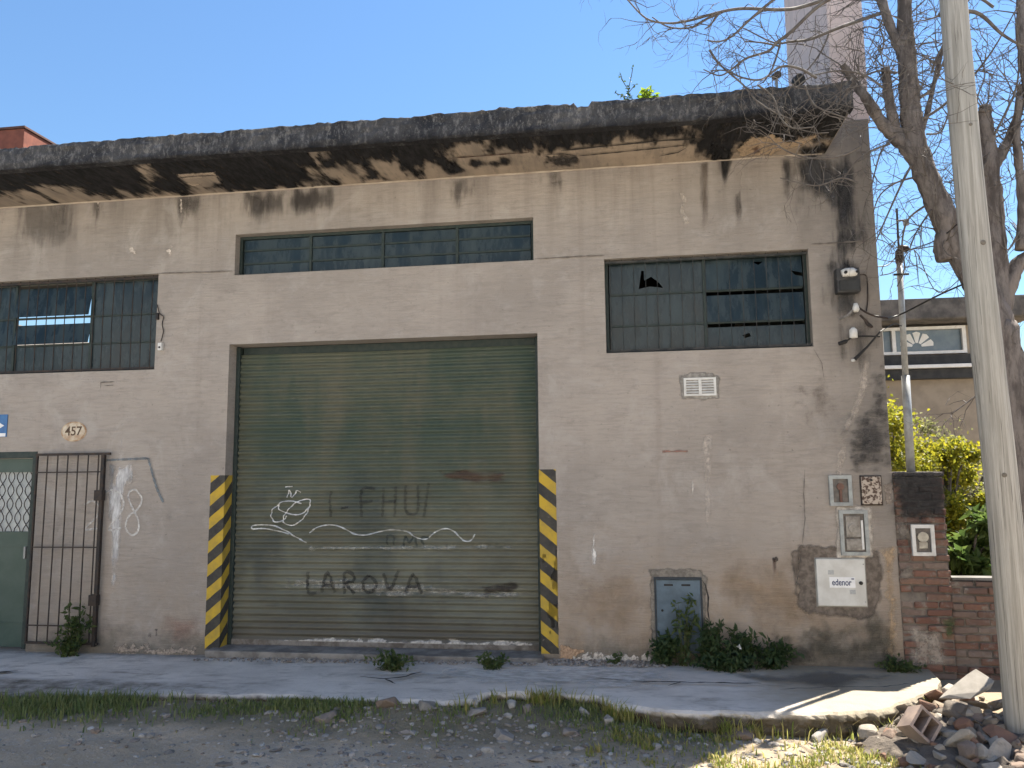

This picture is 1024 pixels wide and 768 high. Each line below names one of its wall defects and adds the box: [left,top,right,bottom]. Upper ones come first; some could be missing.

damp [0,114,860,251]
damp [838,294,855,312]
damp [851,395,888,465]
crack [796,473,806,542]